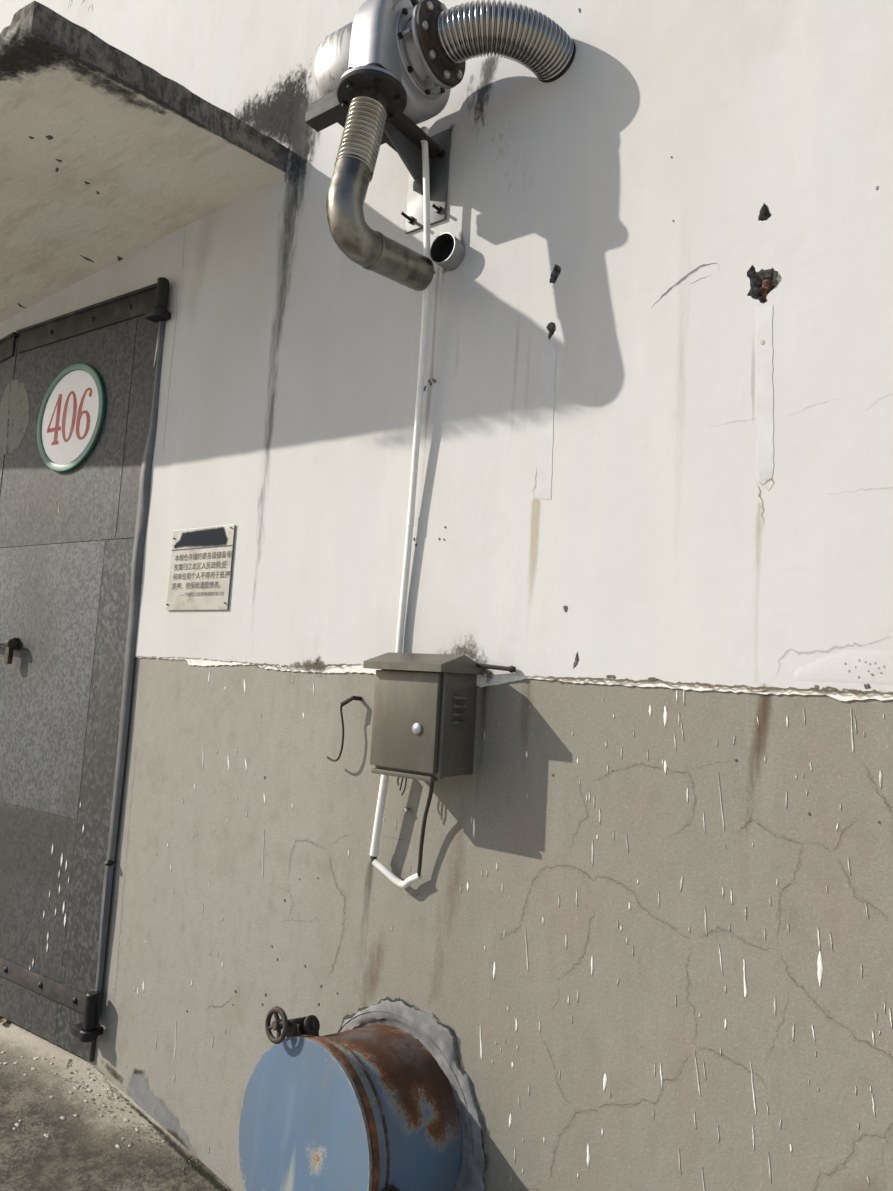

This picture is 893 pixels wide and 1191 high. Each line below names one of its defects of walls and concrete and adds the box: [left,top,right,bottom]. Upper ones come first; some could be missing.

damp [0,25,207,128]
damp [235,71,314,285]
flaking render [758,203,772,221]
flaking render [549,264,561,284]
flaking render [747,265,782,304]
rust [757,688,768,752]